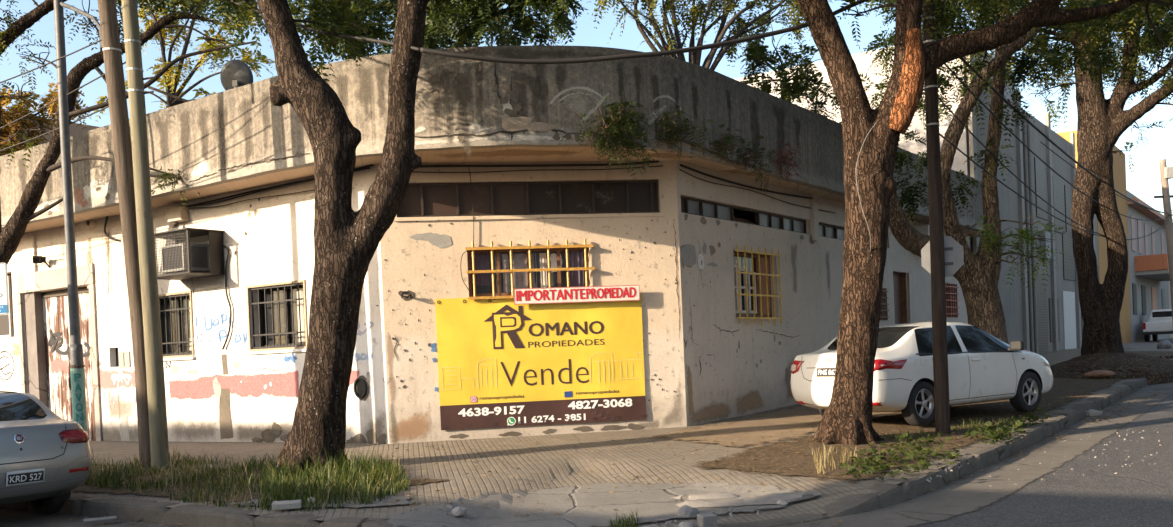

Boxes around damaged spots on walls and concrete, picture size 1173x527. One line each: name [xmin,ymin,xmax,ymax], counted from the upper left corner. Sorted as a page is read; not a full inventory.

water stain [326,67,385,116]
water stain [415,49,698,152]
water stain [157,121,168,158]
water stain [181,94,268,182]
water stain [18,159,26,194]
water stain [36,174,59,213]
water stain [84,131,113,199]